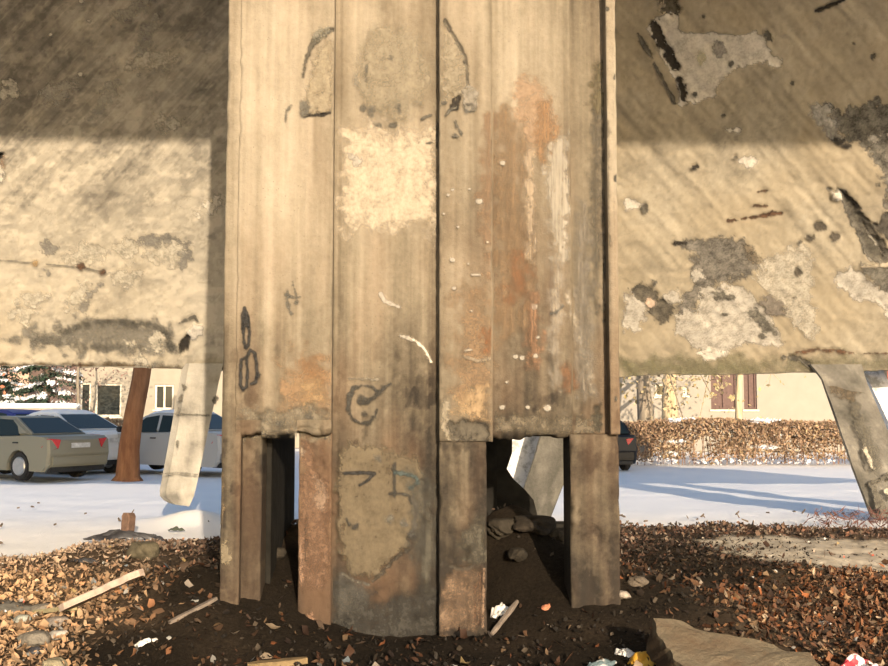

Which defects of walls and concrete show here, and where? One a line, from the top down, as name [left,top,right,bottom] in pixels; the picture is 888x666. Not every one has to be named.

spalling [285,27,334,120]
peeling [637,12,783,107]
peeling [335,121,437,240]
crack [1,260,106,275]
leakage [55,319,175,352]
corrosion [447,74,559,422]
peeling [622,235,821,361]
spalling [827,188,888,318]